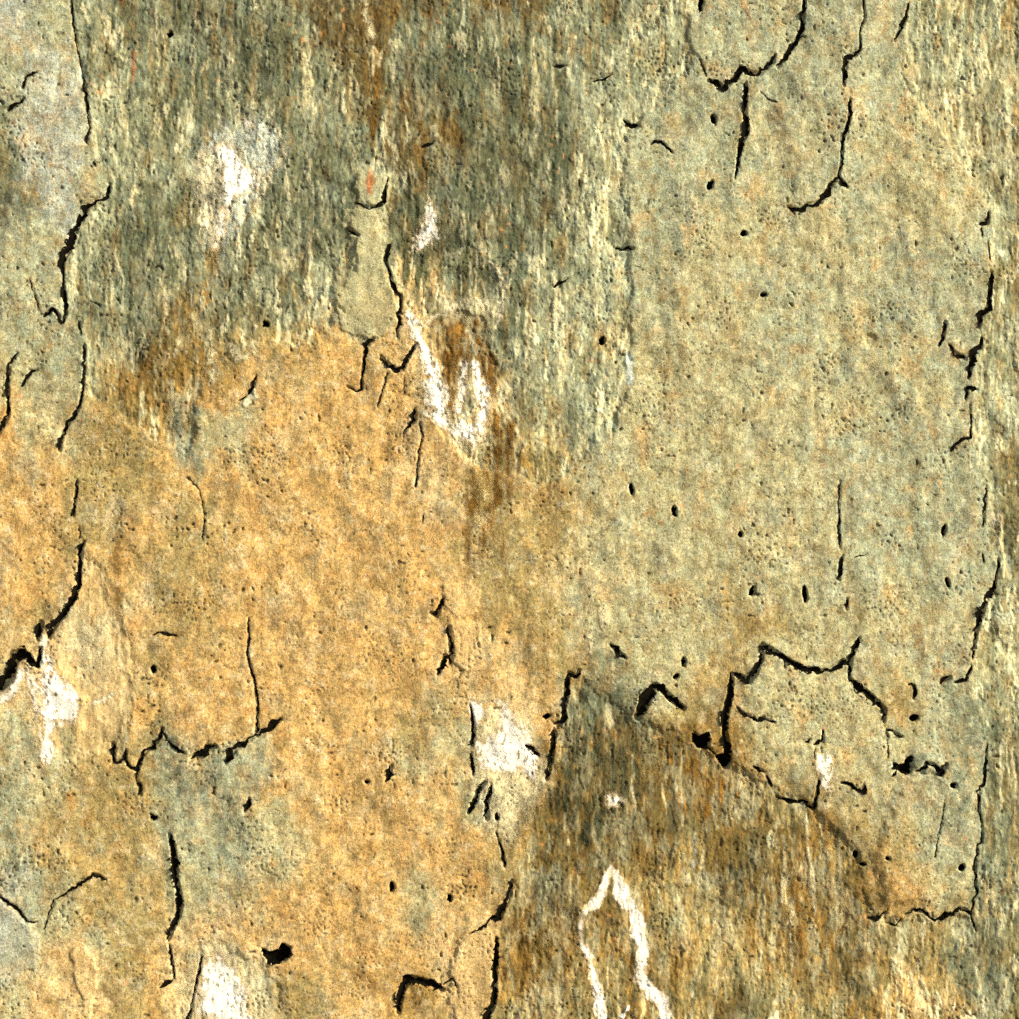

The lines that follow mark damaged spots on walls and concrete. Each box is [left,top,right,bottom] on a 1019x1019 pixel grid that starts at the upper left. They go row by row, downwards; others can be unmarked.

crack [699,0,806,179]
crack [29,0,110,451]
water stain [194,115,287,252]
water stain [389,175,511,455]
crack [0,480,85,690]
water stain [0,600,121,765]
crack [109,618,281,795]
water stain [467,695,546,846]
water stain [557,688,645,847]
crack [718,637,946,857]
crack [468,705,513,1019]
water stain [578,865,675,1019]